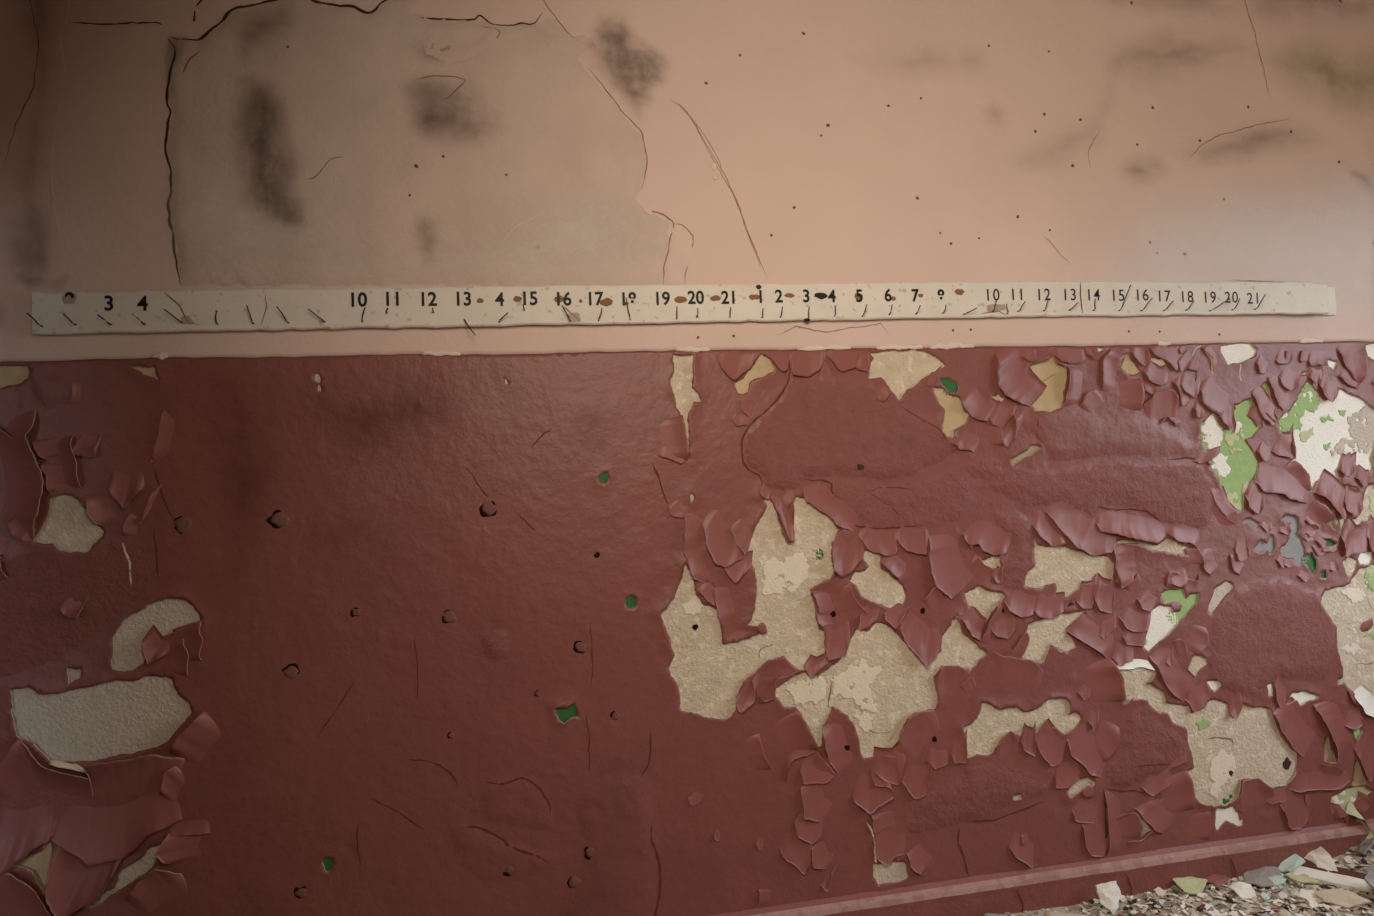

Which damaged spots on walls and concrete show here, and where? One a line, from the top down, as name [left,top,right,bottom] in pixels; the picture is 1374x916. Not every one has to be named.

crack [4,0,39,164]
crack [77,0,278,325]
crack [311,0,387,14]
crack [413,75,465,100]
crack [422,0,694,284]
crack [672,101,766,274]
peeling [0,365,29,388]
peeling [0,410,175,553]
peeling [658,330,1374,909]
peeling [0,597,220,916]